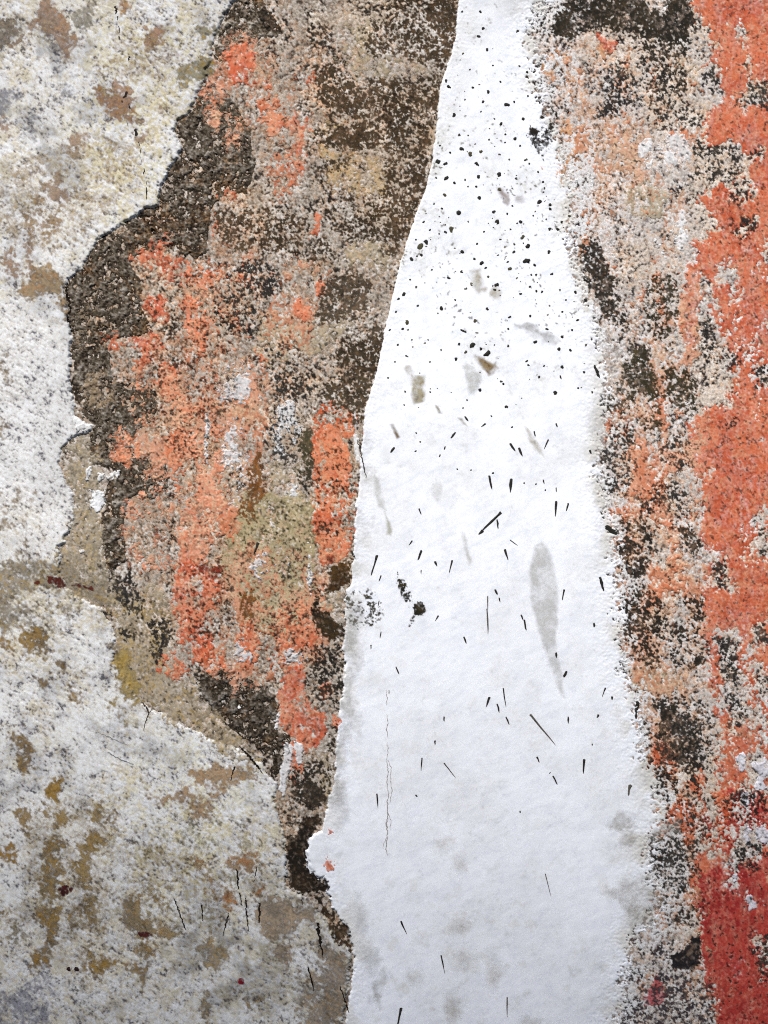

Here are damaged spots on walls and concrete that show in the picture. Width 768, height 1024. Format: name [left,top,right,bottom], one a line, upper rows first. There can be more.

peeling [333,10,428,97]
spalling [52,0,394,809]
damp [531,551,546,585]
damp [534,599,556,649]
peeling [540,0,768,1024]
crack [383,692,392,853]